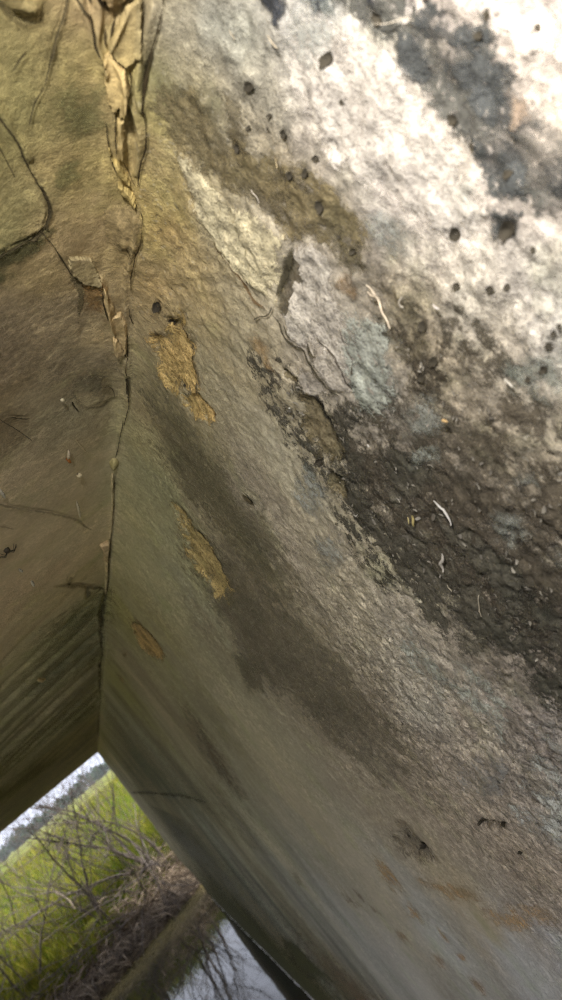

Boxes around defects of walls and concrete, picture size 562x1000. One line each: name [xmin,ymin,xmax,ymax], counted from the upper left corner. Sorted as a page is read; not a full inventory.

crack [0,0,115,276]
flaking render [102,0,143,210]
leakage [286,0,538,255]
crack [102,0,164,515]
spalling [144,309,216,426]
leakage [530,292,555,319]
crack [98,540,111,735]
spalling [170,501,234,605]
leakage [142,390,409,773]
leakage [248,351,562,740]
leakage [509,755,562,842]